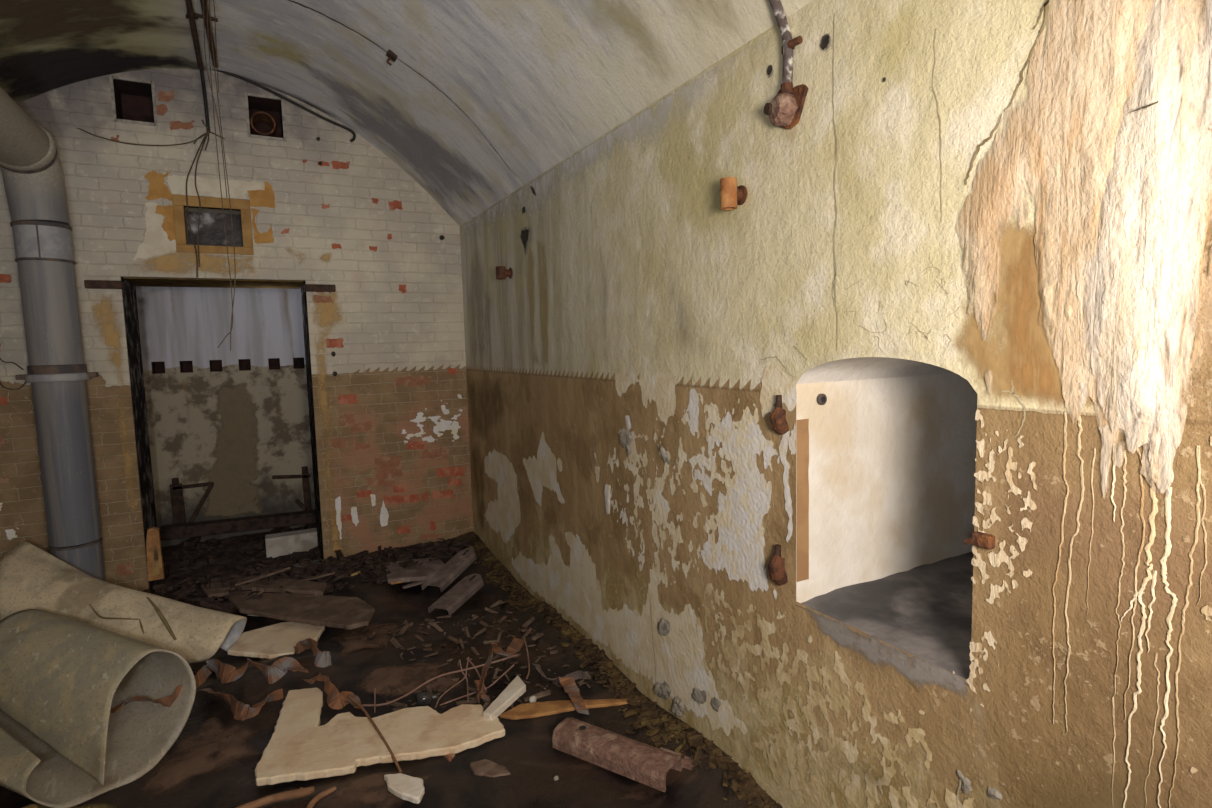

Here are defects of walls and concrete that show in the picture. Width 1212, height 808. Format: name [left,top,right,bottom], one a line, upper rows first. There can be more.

flaking render [302,159,350,169]
peeling [144,170,176,241]
peeling [247,181,290,244]
flaking render [372,198,403,210]
peeling [401,394,462,450]
leakage [956,0,1212,808]
flaking render [335,466,465,540]
peeling [484,432,565,543]
peeling [971,409,1037,604]
peeling [512,364,1003,808]